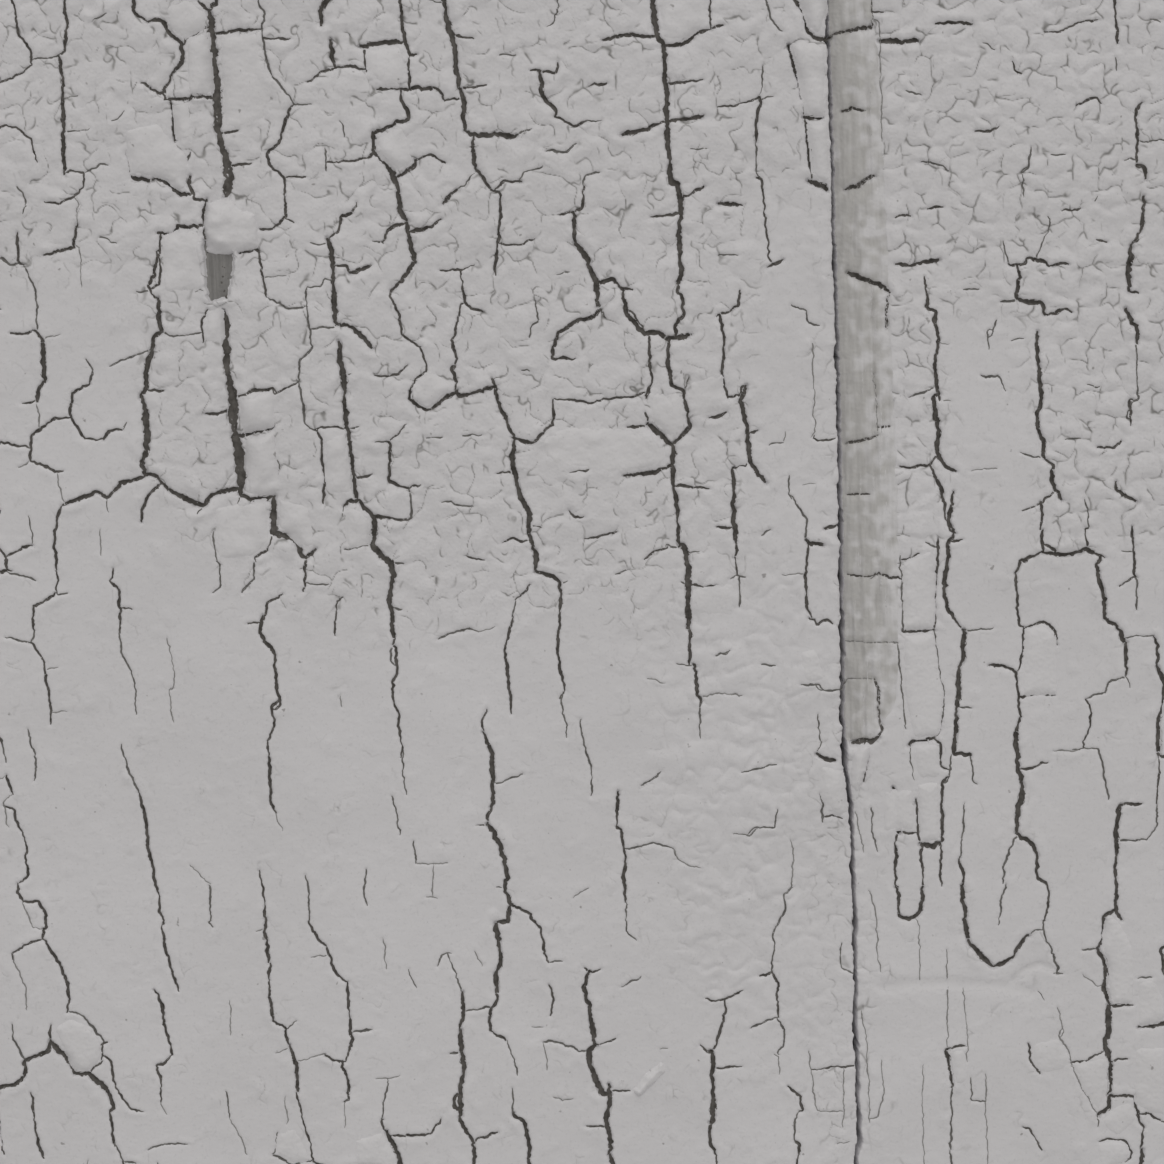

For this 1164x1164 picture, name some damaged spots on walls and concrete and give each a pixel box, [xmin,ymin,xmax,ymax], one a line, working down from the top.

peeling [161,197,258,342]
crack [0,0,786,899]
peeling [828,0,944,843]
crack [765,0,1022,191]
crack [1045,0,1119,71]
crack [1076,97,1102,106]
crack [782,102,1164,1164]
crack [0,737,187,1164]
crack [256,869,372,1164]
crack [376,709,630,1164]
crack [615,791,700,941]
crack [700,809,885,1164]